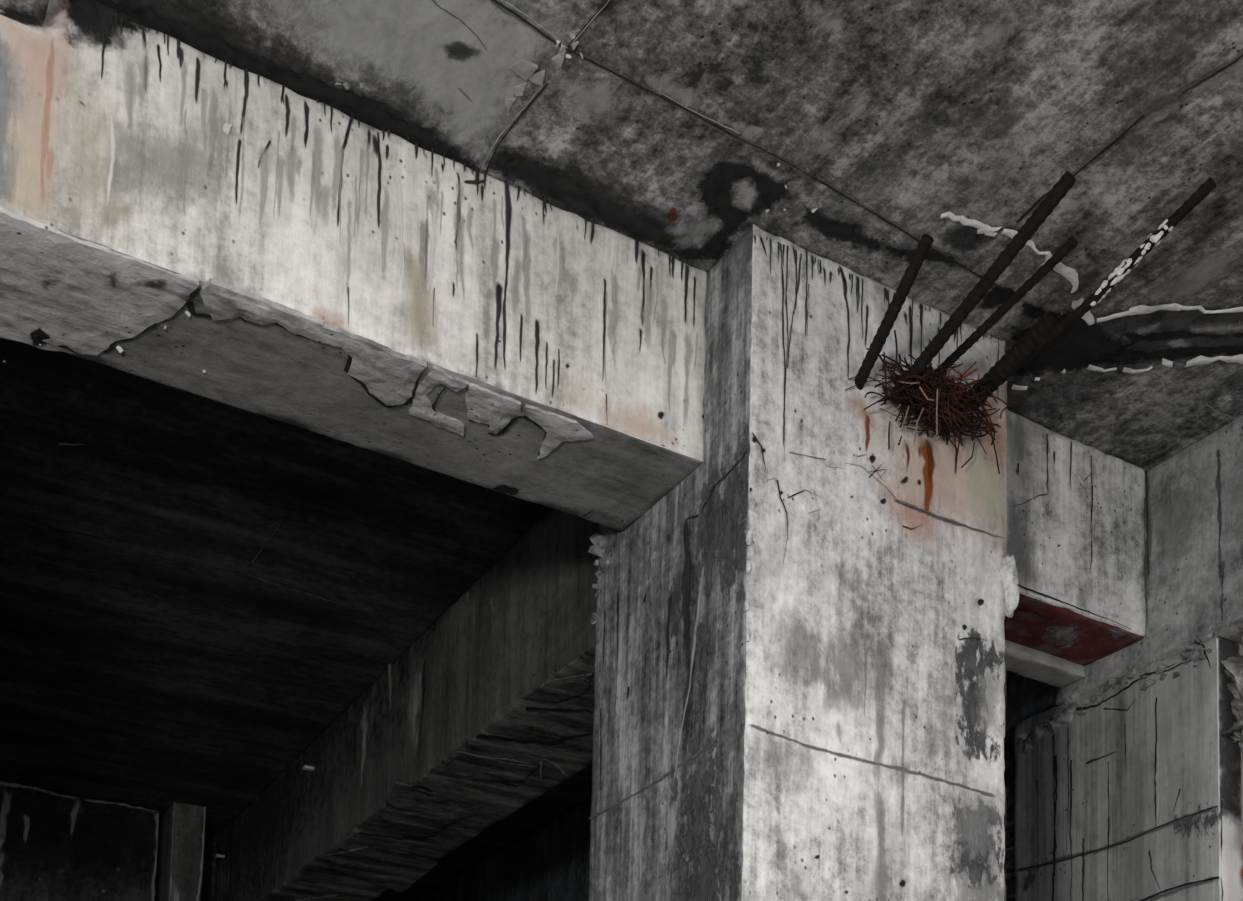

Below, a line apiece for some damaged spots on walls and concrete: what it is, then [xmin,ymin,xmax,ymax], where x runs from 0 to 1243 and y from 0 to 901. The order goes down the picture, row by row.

damp [1193,65,1243,95]
flaking render [0,207,594,459]
damp [0,0,869,446]
spalling [855,234,934,390]
spalling [890,171,1078,404]
damp [801,208,1243,390]
spalling [966,177,1217,409]
corrosion [906,402,999,519]
damp [954,628,1006,762]
damp [948,795,1004,901]
crack [1036,698,1180,901]